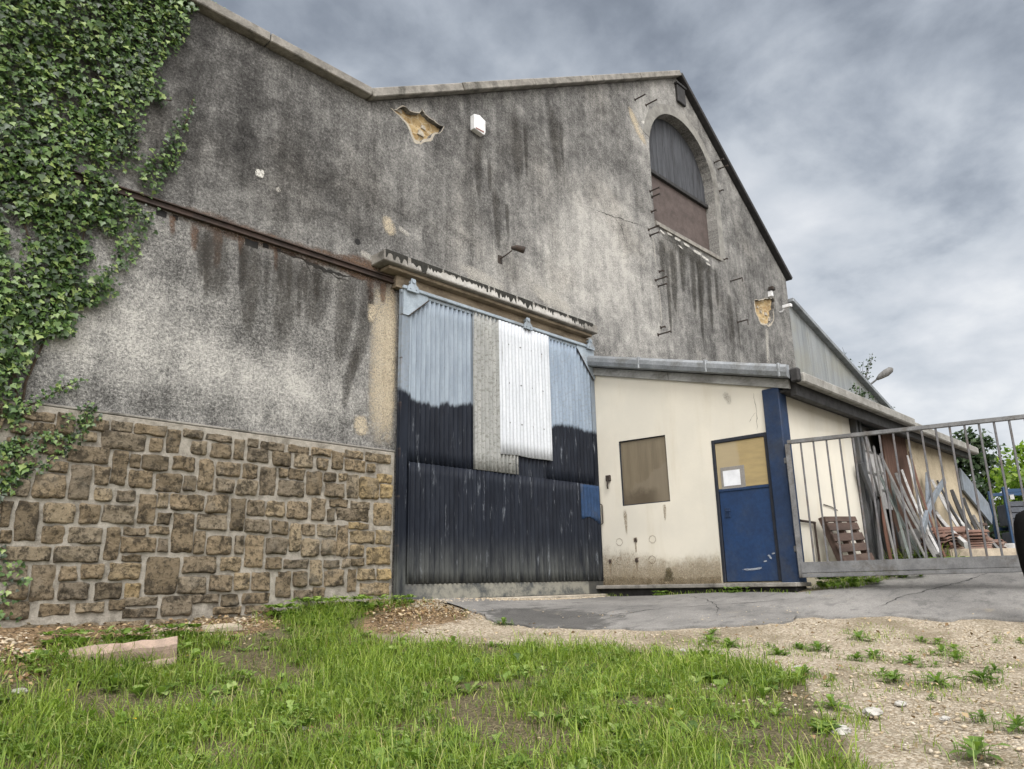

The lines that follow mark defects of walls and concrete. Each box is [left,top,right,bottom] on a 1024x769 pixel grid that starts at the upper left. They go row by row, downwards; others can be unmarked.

flaking render [391,105,444,145]
corrosion [191,213,395,313]
crack [269,247,361,281]
peeling [386,249,593,328]
water stain [653,236,740,340]
flaking render [754,297,775,327]
flaking render [354,294,396,434]
water stain [598,554,722,594]